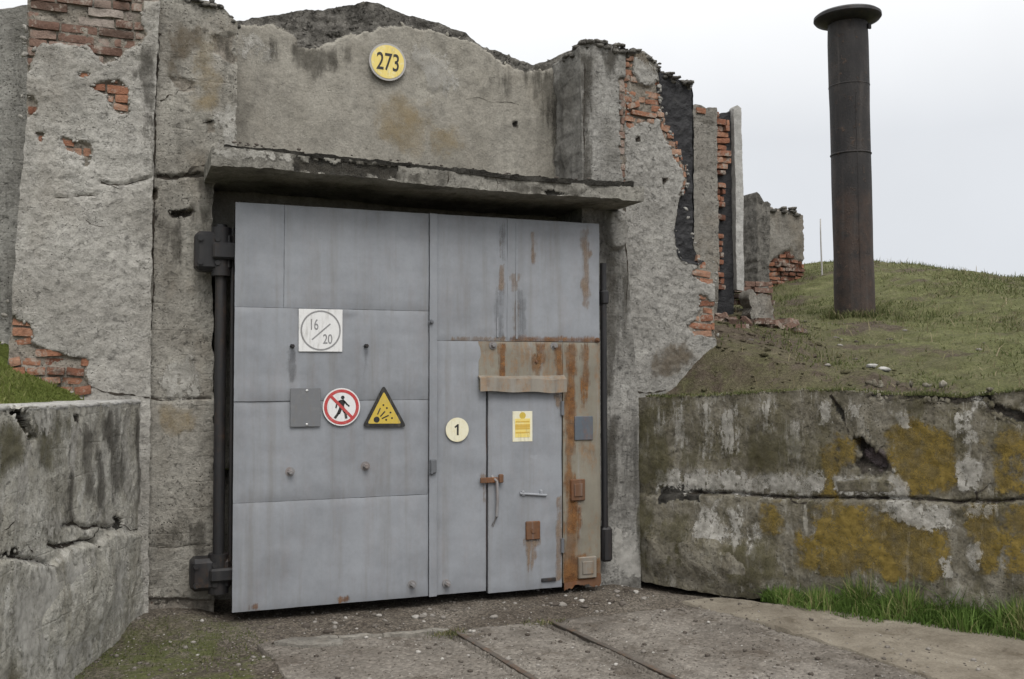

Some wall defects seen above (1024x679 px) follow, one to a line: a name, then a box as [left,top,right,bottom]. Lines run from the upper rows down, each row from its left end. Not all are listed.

spalling [19,0,166,75]
spalling [79,72,133,119]
spalling [59,136,93,164]
peeling [263,1,805,341]
spalling [1,299,94,396]
water stain [44,409,141,537]
rust [497,336,600,583]
crack [688,481,1024,504]
spalling [847,430,897,475]
crack [9,515,210,568]